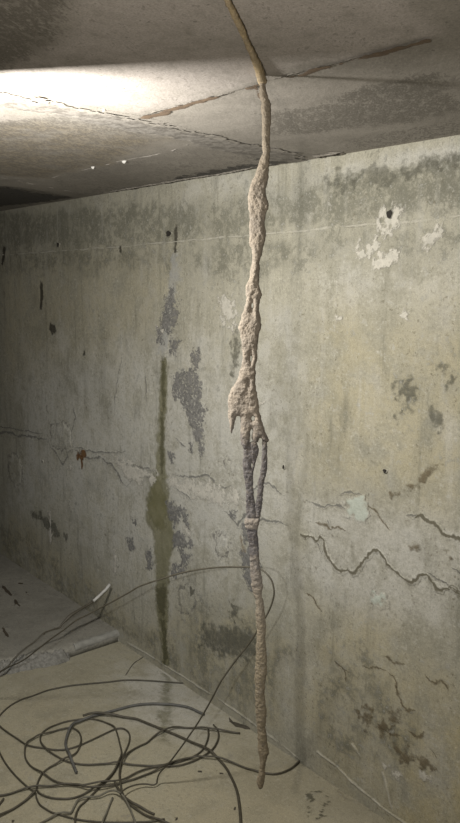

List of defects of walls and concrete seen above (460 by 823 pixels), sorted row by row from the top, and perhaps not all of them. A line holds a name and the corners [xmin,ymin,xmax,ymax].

corrosion [286,39,431,78]
corrosion [141,97,219,119]
peeling [355,234,400,270]
peeling [422,222,443,252]
peeling [156,287,182,357]
peeling [171,346,208,460]
water stain [97,245,246,665]
crack [0,403,460,602]
peeling [229,510,253,592]